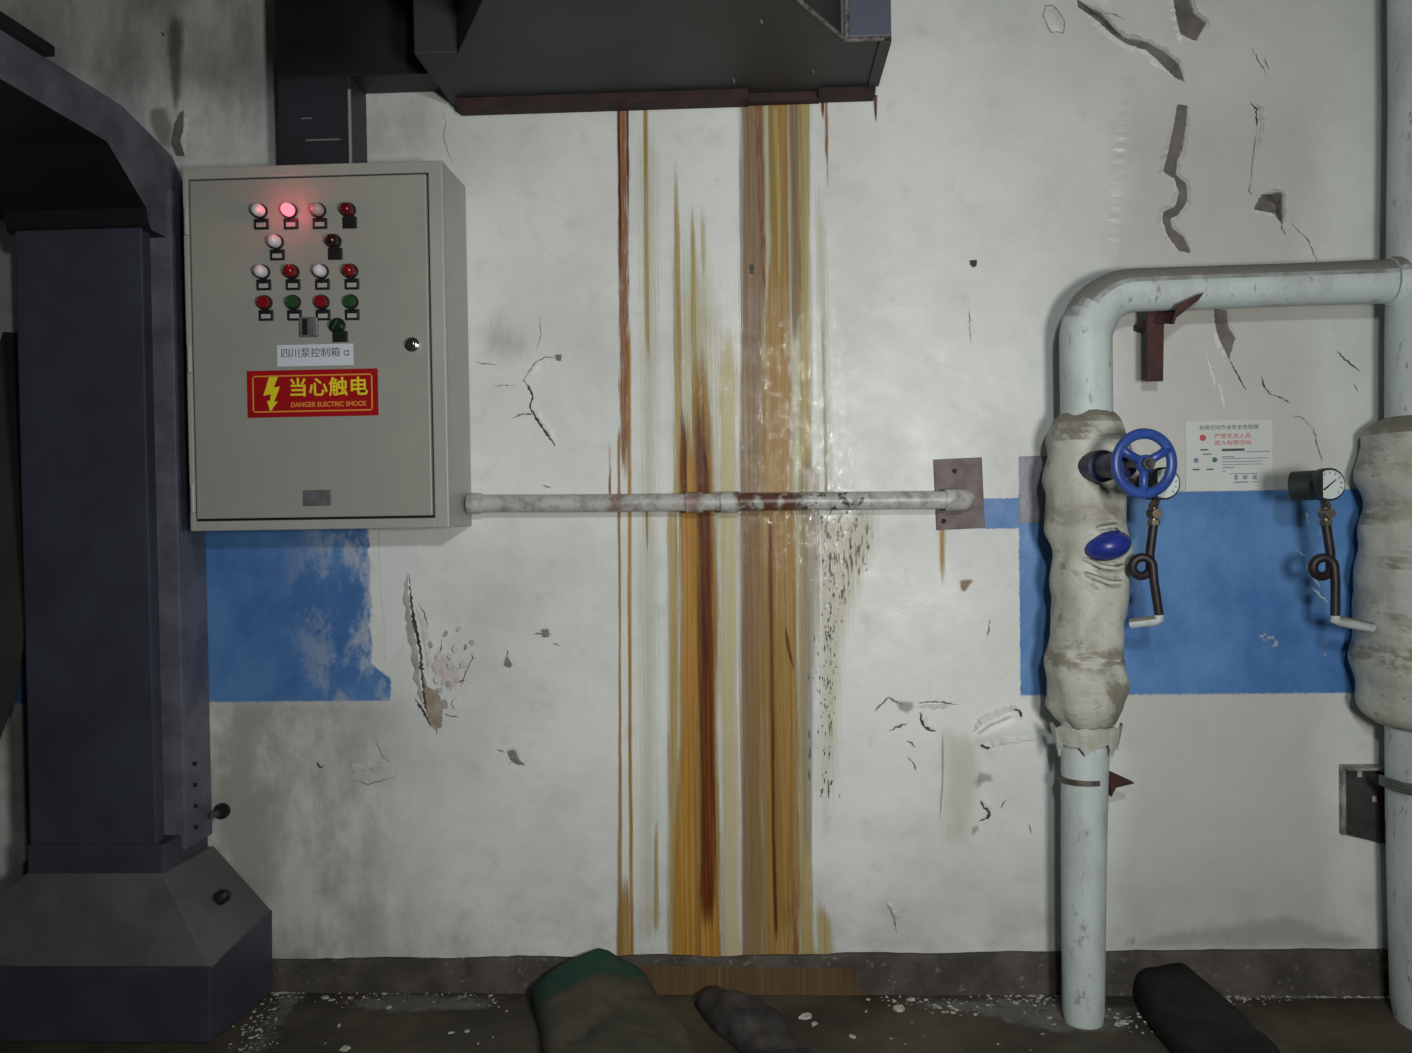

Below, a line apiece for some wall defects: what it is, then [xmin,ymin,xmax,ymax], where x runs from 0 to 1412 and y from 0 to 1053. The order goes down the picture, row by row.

flaking render [1077,0,1210,81]
flaking render [1156,104,1192,254]
crack [1248,48,1269,194]
flaking render [1253,188,1287,233]
crack [477,318,562,445]
rust [609,110,649,494]
rust [674,103,828,494]
peeling [402,572,477,734]
damp [808,510,873,797]
rust [617,510,859,995]